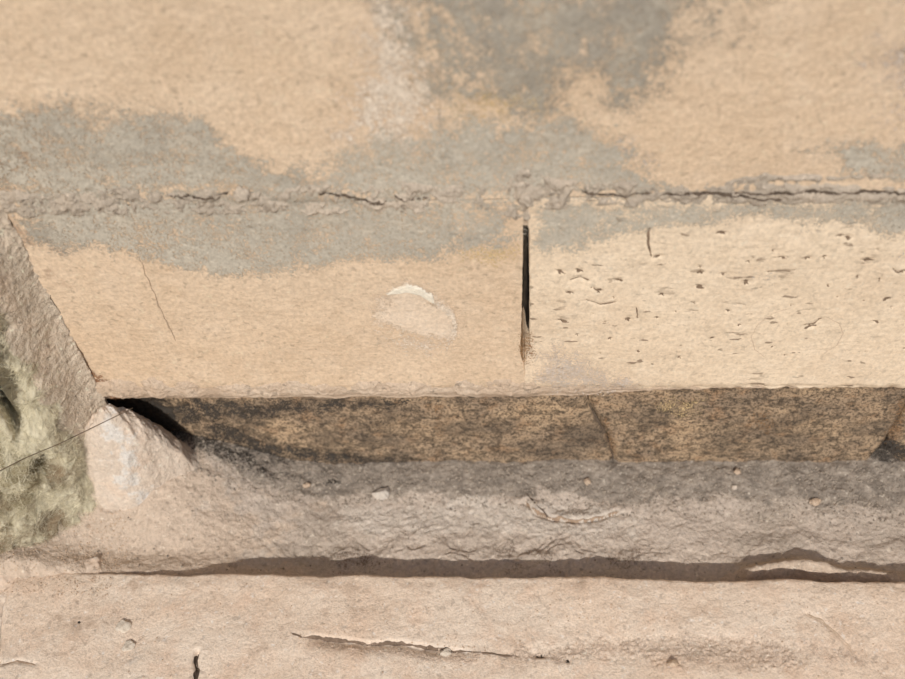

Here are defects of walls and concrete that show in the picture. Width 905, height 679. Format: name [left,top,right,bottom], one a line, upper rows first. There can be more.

leakage [0,0,905,281]
crack [583,189,905,202]
crack [521,226,529,328]
peeling [369,279,466,363]
crack [192,655,200,679]
crack [292,633,520,658]